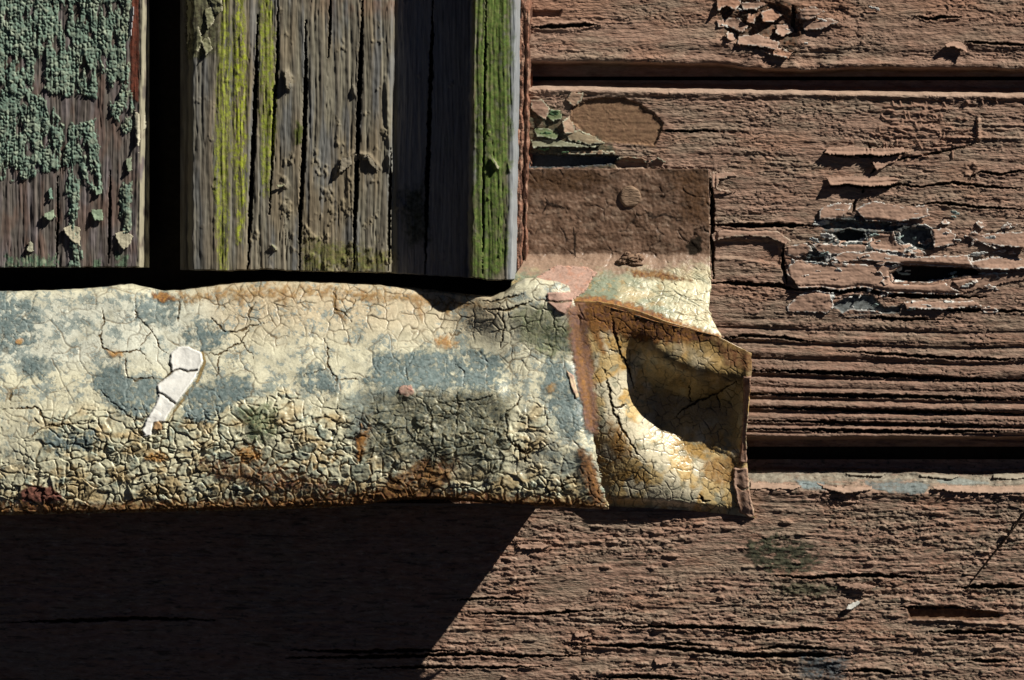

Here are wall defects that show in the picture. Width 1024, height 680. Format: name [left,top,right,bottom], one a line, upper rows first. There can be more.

peeling [716,0,838,59]
peeling [0,0,146,267]
crack [298,0,331,271]
crack [353,1,363,269]
peeling [824,146,904,187]
crack [98,308,168,382]
crack [209,302,264,376]
rust [152,283,480,320]
crack [604,332,639,455]
rust [567,296,752,459]
peeling [686,201,1024,318]
peeling [733,467,1024,517]